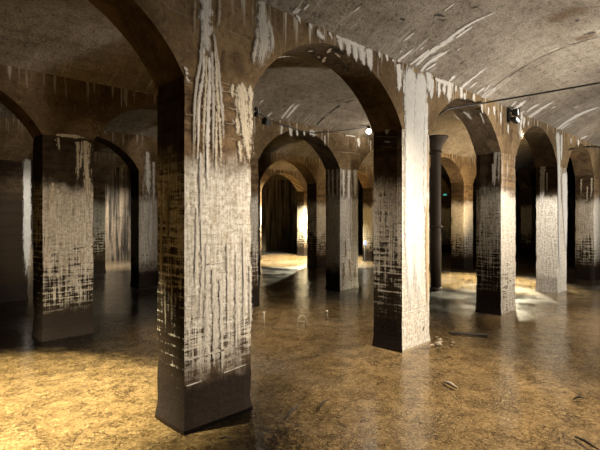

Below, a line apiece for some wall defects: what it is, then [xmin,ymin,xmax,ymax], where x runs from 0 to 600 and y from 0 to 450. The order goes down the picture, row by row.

damp [144,151,173,323]
damp [188,0,253,373]
damp [280,104,316,136]
damp [309,12,556,309]